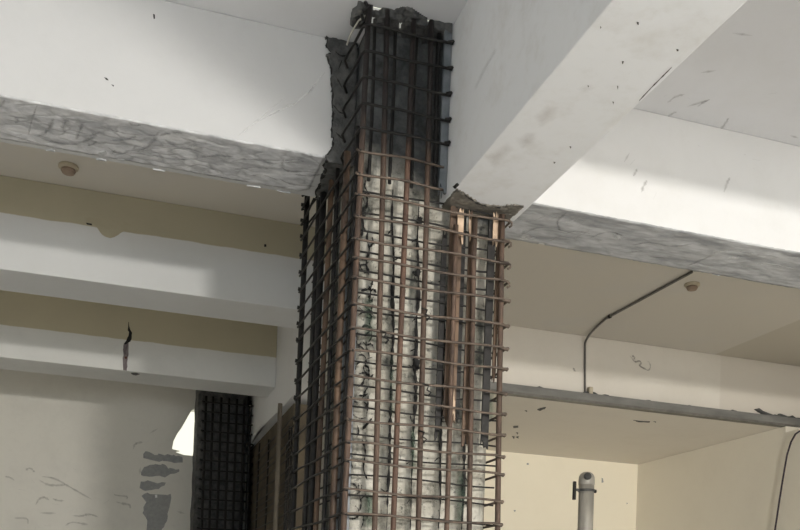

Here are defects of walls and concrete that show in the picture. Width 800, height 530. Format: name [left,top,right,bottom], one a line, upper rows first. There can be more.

spalling [350,1,453,48]
crack [349,170,467,530]
peeling [140,451,183,530]